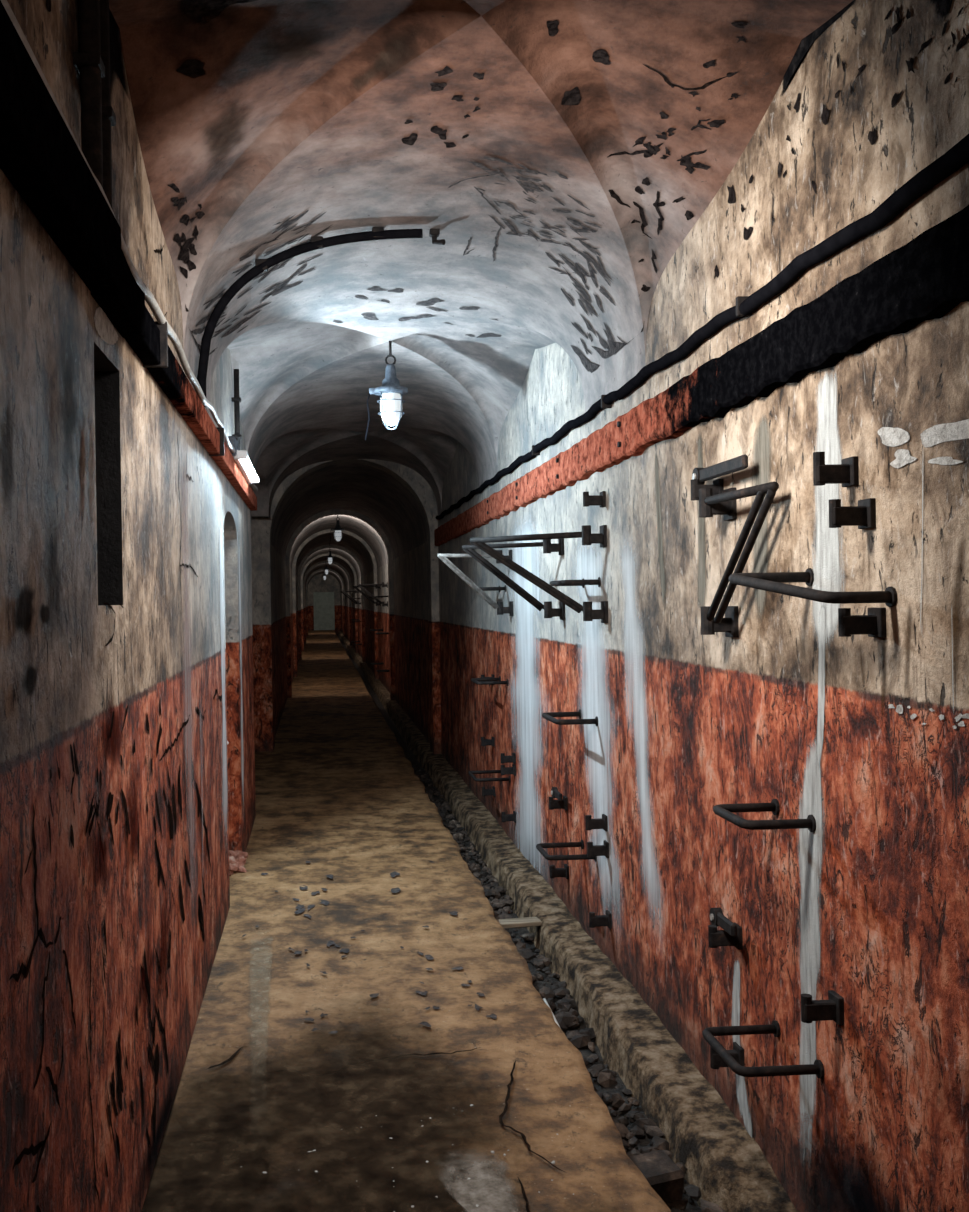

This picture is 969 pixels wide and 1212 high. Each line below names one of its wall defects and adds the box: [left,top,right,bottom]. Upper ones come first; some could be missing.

spalling [546,20,559,37]
spalling [176,59,206,78]
spalling [592,50,611,65]
spalling [561,87,581,105]
spalling [878,419,969,468]
crack [159,689,222,761]
crack [9,804,100,1212]
crack [208,1047,243,1069]
crack [419,1047,481,1055]
crack [499,1061,565,1212]